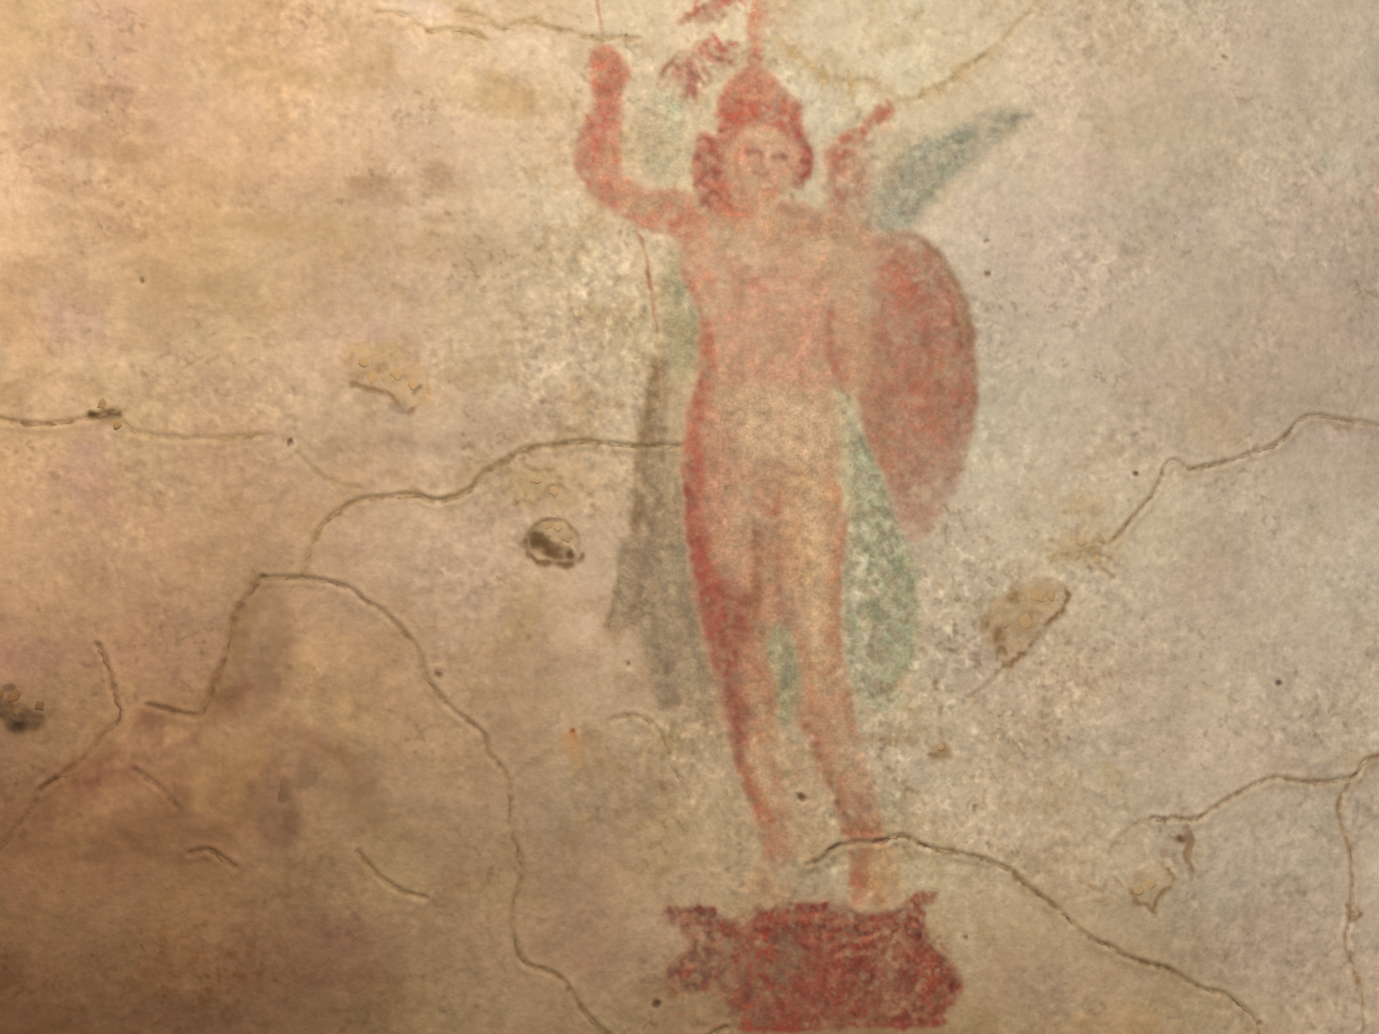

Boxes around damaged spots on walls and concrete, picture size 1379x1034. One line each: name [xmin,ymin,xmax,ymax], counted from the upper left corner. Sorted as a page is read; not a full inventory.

crack [11,415,101,426]
spalling [513,463,595,569]
crack [1114,416,1371,540]
crack [161,441,674,718]
spalling [980,582,1071,667]
spalling [0,683,44,736]
crack [99,651,121,735]
crack [428,681,512,815]
crack [1155,787,1250,824]
crack [511,847,525,962]
crack [814,835,1262,1034]
crack [1283,755,1379,1030]